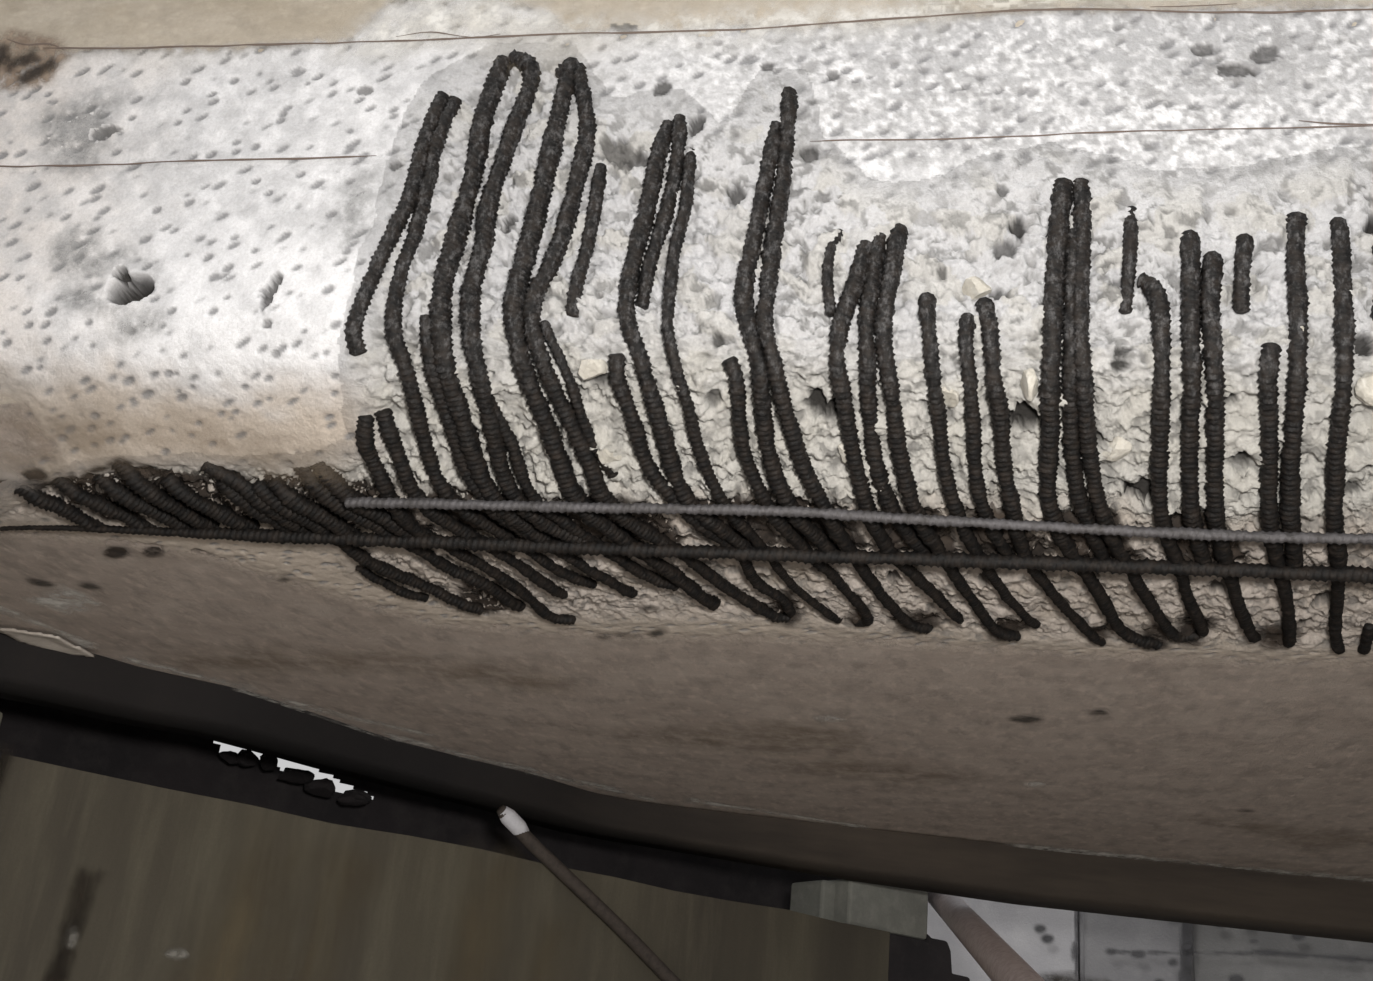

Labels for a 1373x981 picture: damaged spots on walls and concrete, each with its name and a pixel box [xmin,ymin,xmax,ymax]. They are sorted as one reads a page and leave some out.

spalling [0,0,1373,664]